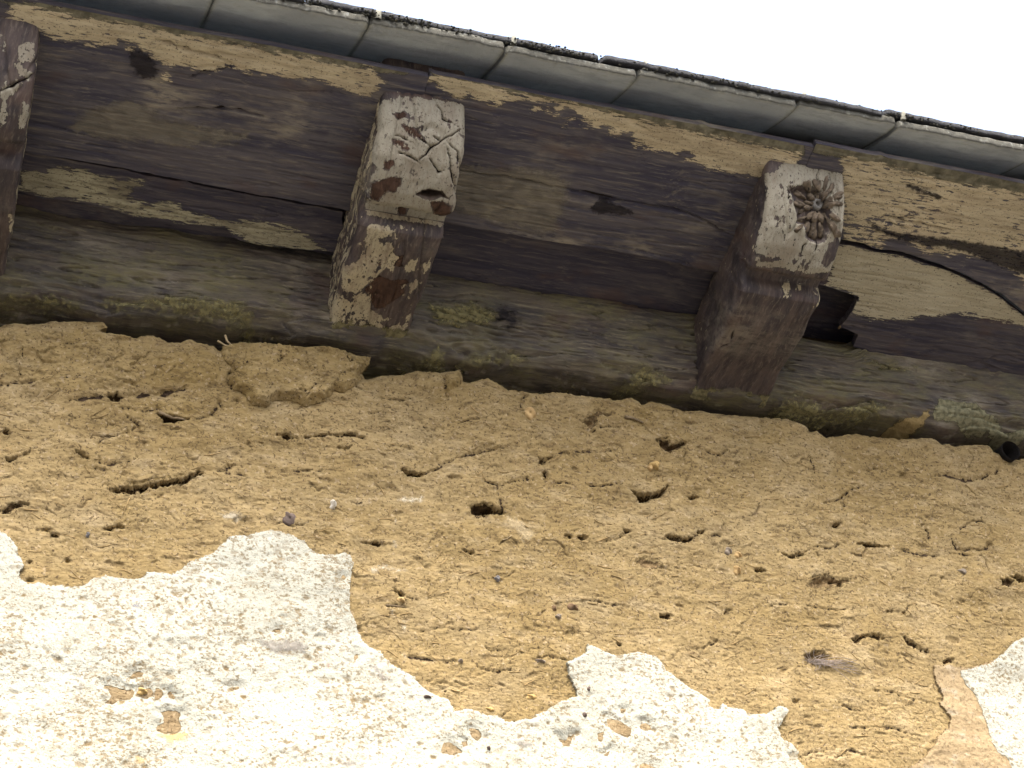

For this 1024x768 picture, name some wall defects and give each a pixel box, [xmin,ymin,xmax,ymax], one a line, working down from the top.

crack [399,114,459,188]
peeling [0,1,1024,331]
spalling [583,412,602,429]
spalling [657,438,685,453]
spalling [113,474,201,495]
spalling [471,504,500,518]
spalling [636,559,662,569]
spalling [809,576,848,588]
spalling [804,652,827,666]
peeling [104,671,181,734]
peeling [597,709,651,756]